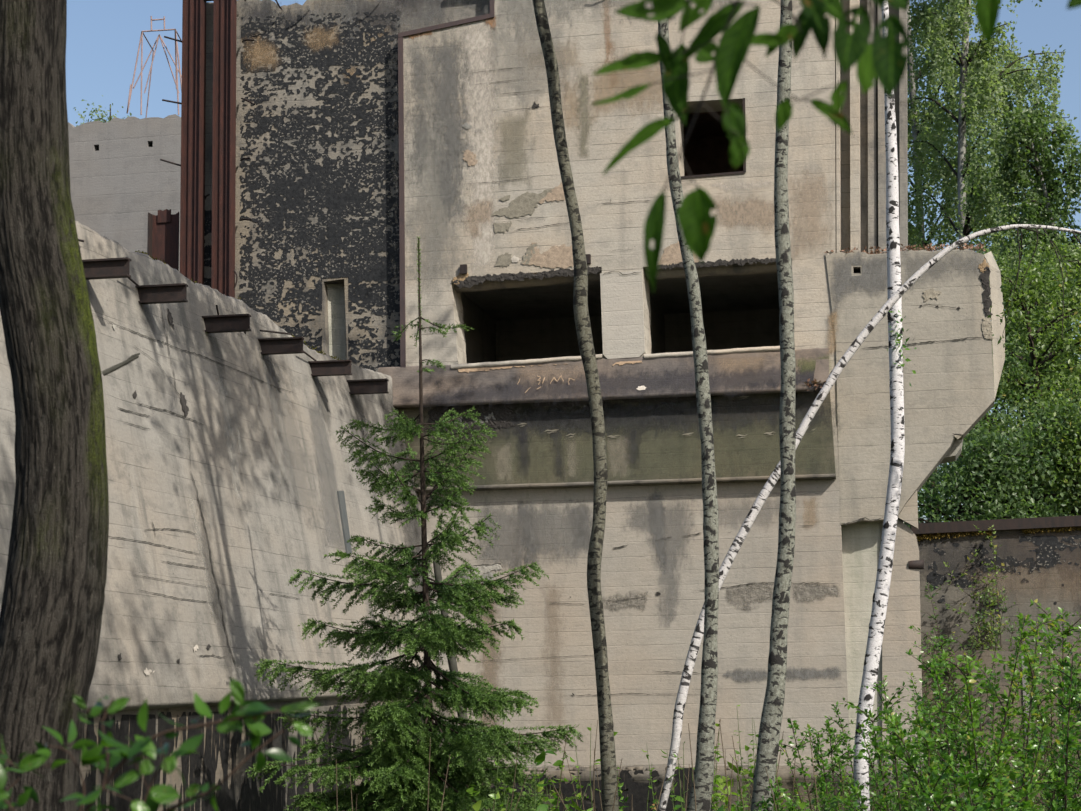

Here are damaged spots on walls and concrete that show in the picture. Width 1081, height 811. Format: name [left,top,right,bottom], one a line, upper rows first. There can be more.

peeling [239,0,400,371]
damp [435,24,497,270]
peeling [468,183,565,236]
spalling [978,258,994,340]
peeling [927,535,1081,603]